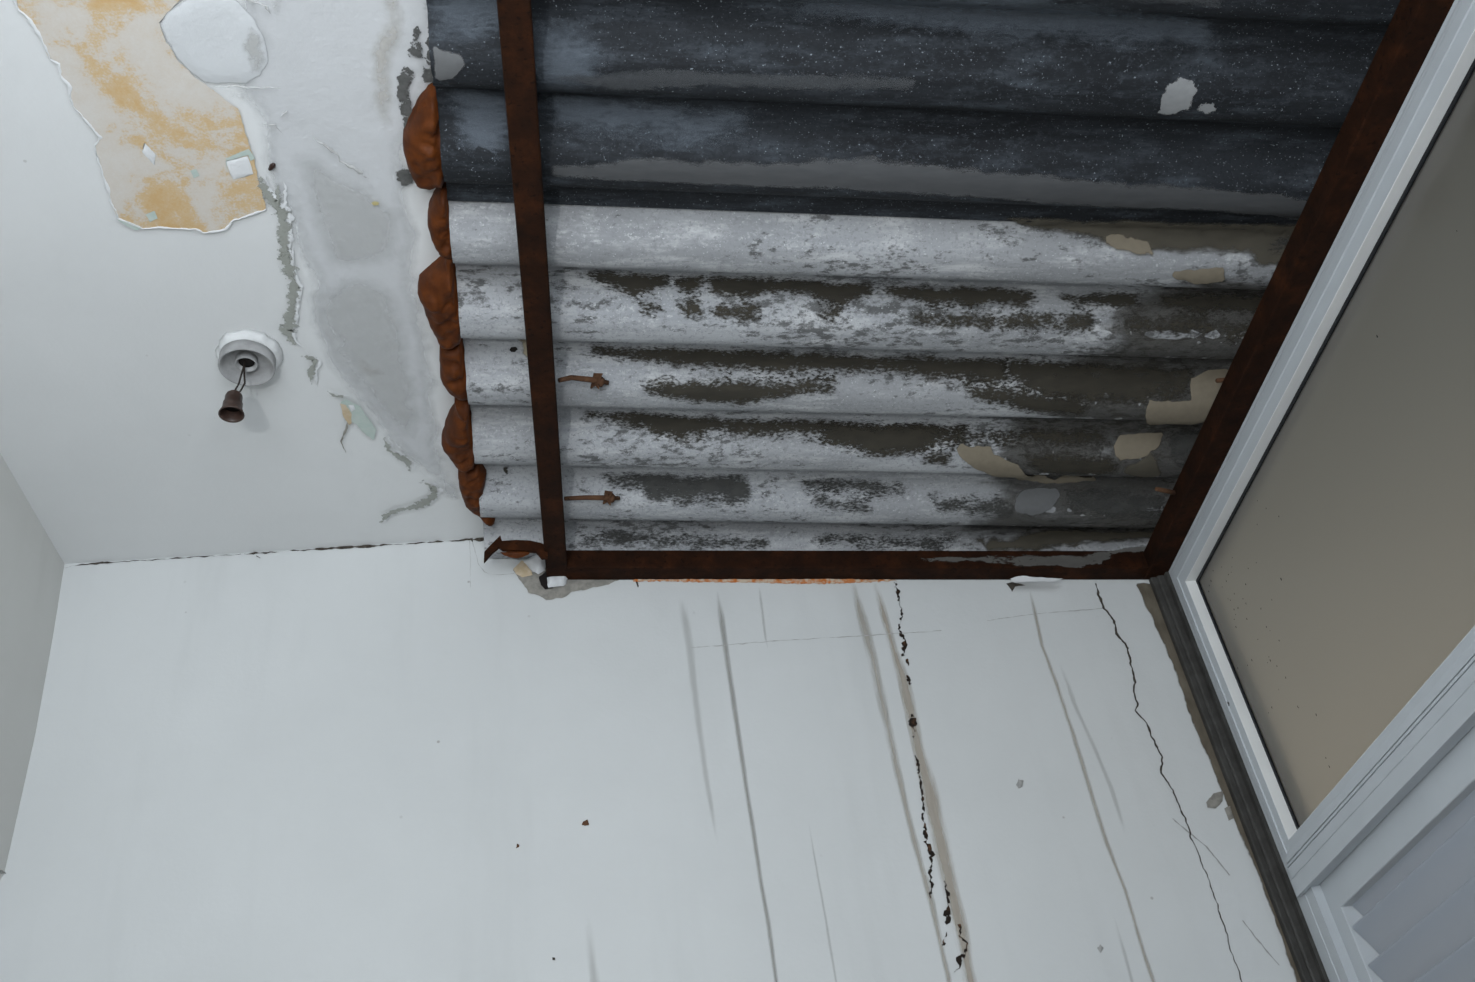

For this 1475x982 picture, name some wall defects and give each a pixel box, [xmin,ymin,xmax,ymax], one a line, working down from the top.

peeling [12,0,266,234]
crack [70,173,514,587]
mould [580,529,769,551]
mould [815,533,951,551]
mould [583,344,1194,519]
mould [586,270,1263,343]
water stain [721,617,777,982]
crack [692,582,968,972]
water stain [857,602,950,982]
crack [987,583,1279,982]